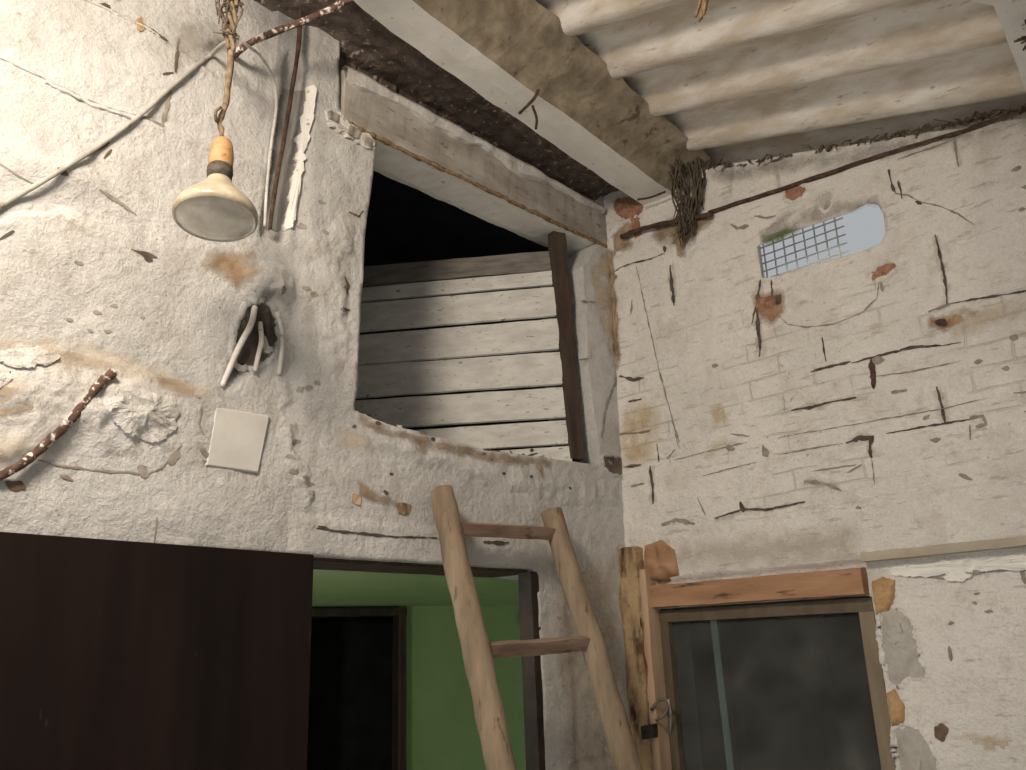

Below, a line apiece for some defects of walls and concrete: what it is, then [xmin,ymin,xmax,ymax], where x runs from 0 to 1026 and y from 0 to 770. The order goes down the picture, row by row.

crack [888,137,974,225]
spalling [865,259,901,284]
crack [928,235,1026,312]
crack [601,245,988,526]
spalling [5,481,26,491]
spalling [397,502,411,515]
spalling [876,604,930,691]
spalling [890,720,949,770]